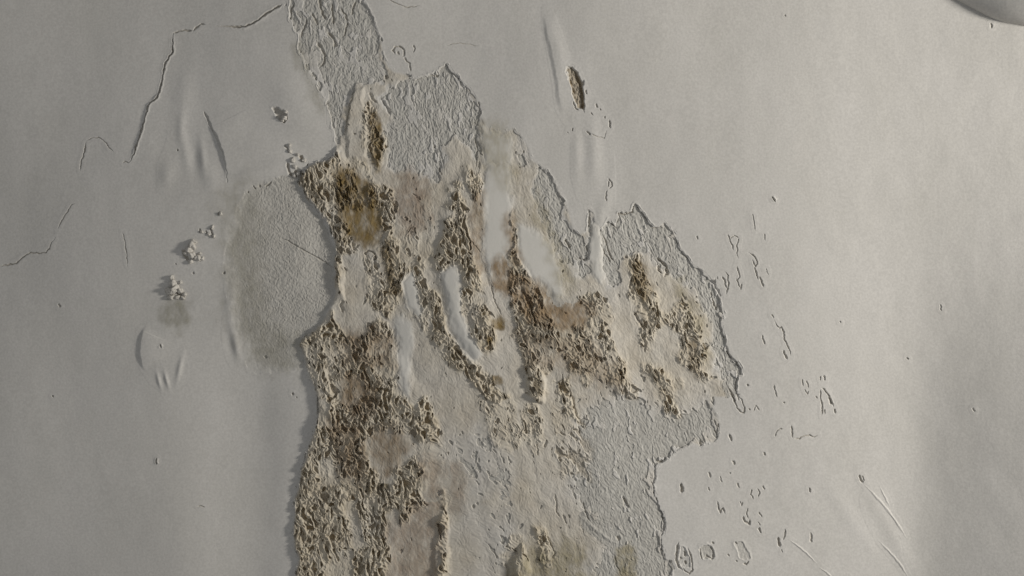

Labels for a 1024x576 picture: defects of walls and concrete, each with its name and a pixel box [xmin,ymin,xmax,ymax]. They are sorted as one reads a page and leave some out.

crack [0,0,287,271]
flaking render [164,0,795,576]
leakage [493,262,585,331]
crack [770,422,822,443]